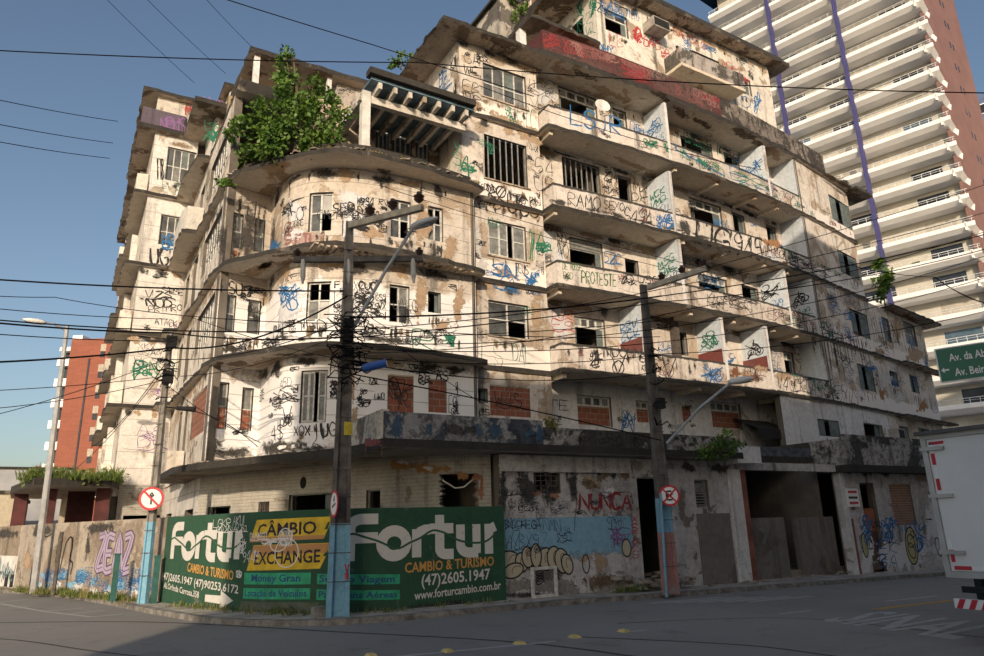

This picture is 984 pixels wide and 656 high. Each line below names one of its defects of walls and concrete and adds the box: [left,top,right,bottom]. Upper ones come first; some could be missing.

water stain [600,0,648,20]
water stain [485,50,548,86]
peeling [536,64,627,107]
spalling [628,0,779,75]
water stain [670,25,767,76]
water stain [718,96,806,153]
water stain [444,408,502,439]
flaking render [390,460,485,507]
water stain [85,522,119,560]